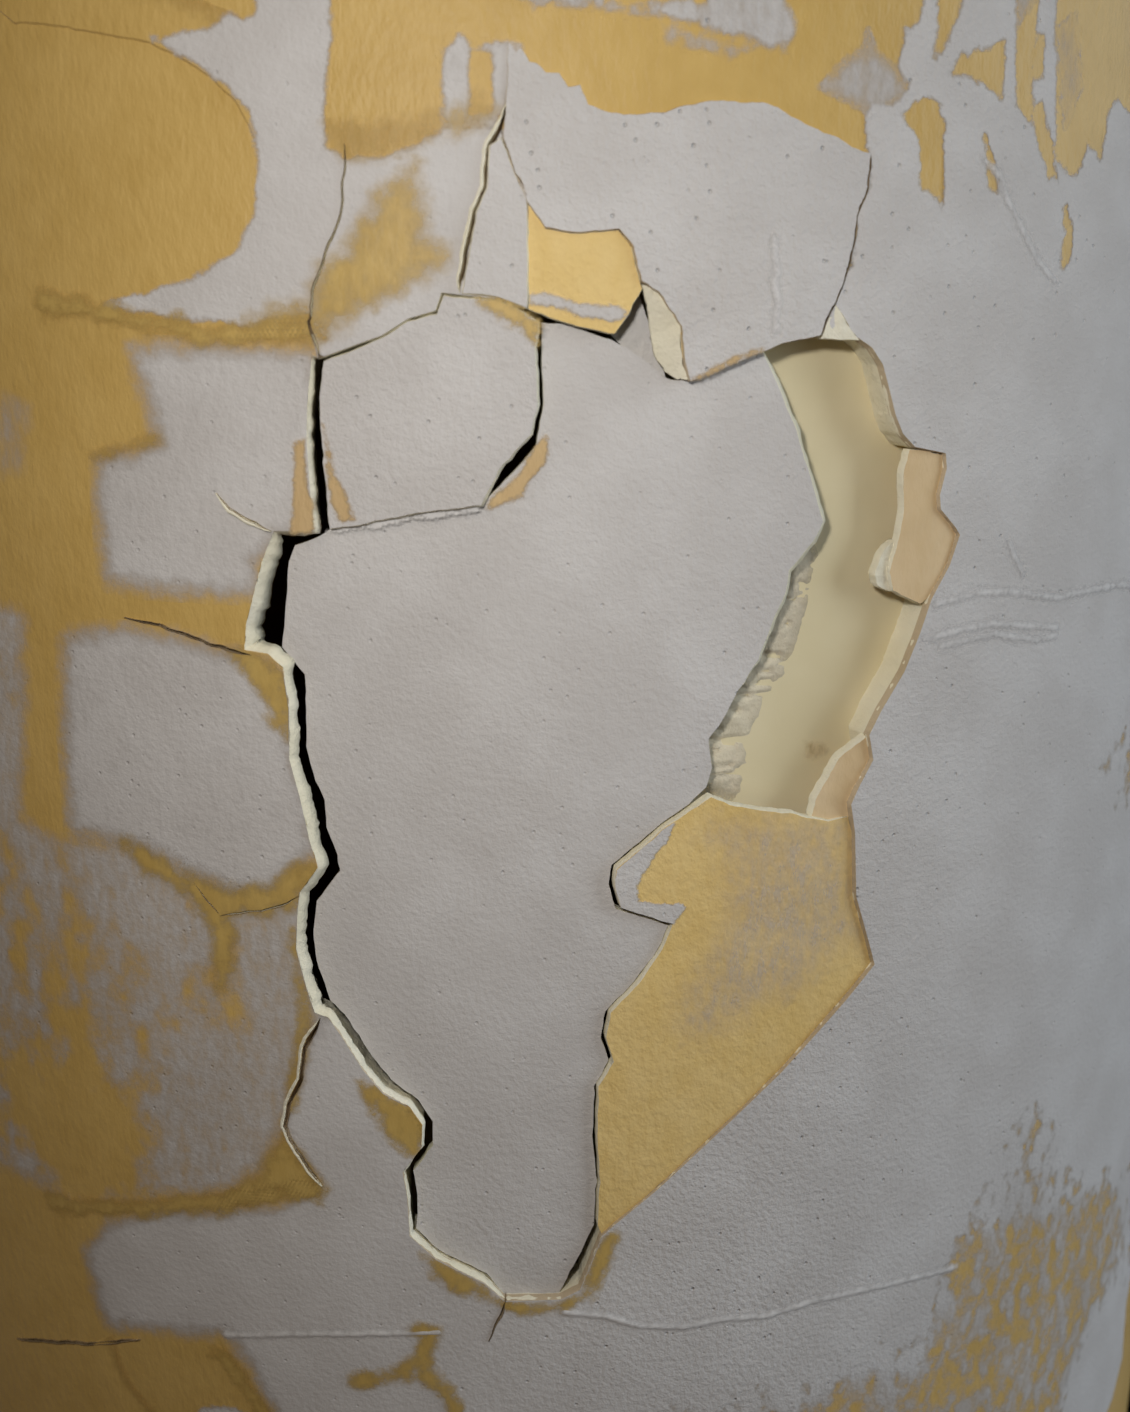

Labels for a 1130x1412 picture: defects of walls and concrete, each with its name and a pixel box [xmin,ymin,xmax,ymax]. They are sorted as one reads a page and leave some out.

crack [307,144,346,357]
crack [456,104,515,293]
crack [824,157,871,326]
crack [215,493,271,532]
spalling [244,137,956,1300]
crack [196,886,297,916]
crack [280,1018,323,1187]